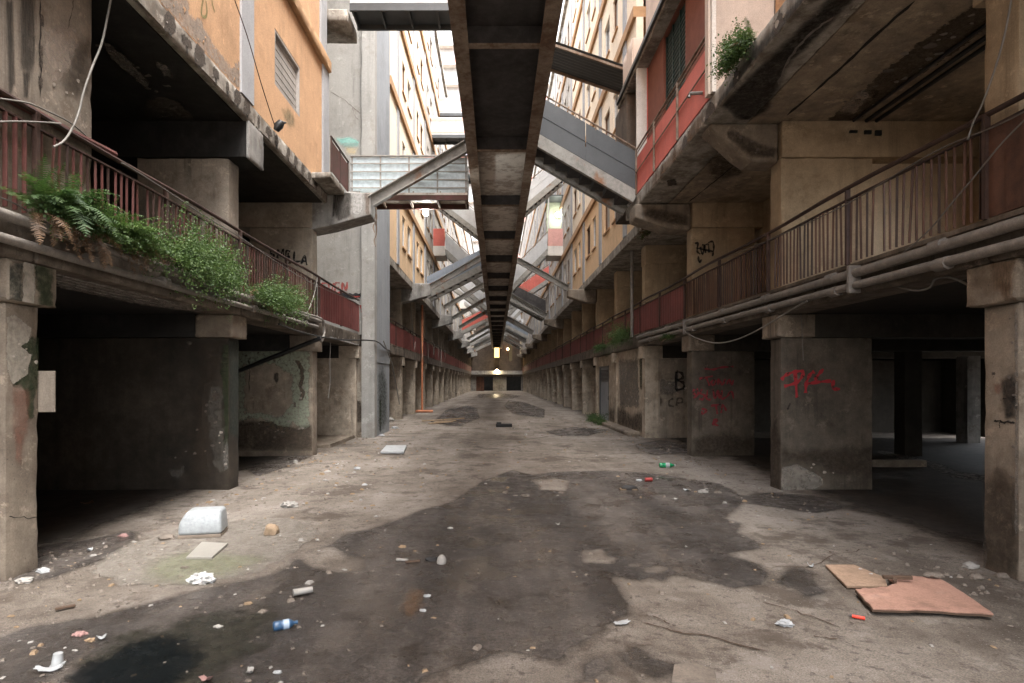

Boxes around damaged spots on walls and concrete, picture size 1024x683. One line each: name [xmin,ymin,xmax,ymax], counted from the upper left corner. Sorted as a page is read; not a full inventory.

damp [7,0,35,97]
damp [68,45,87,94]
damp [718,0,852,120]
peeling [6,314,38,384]
peeling [169,387,228,478]
damp [192,341,312,477]